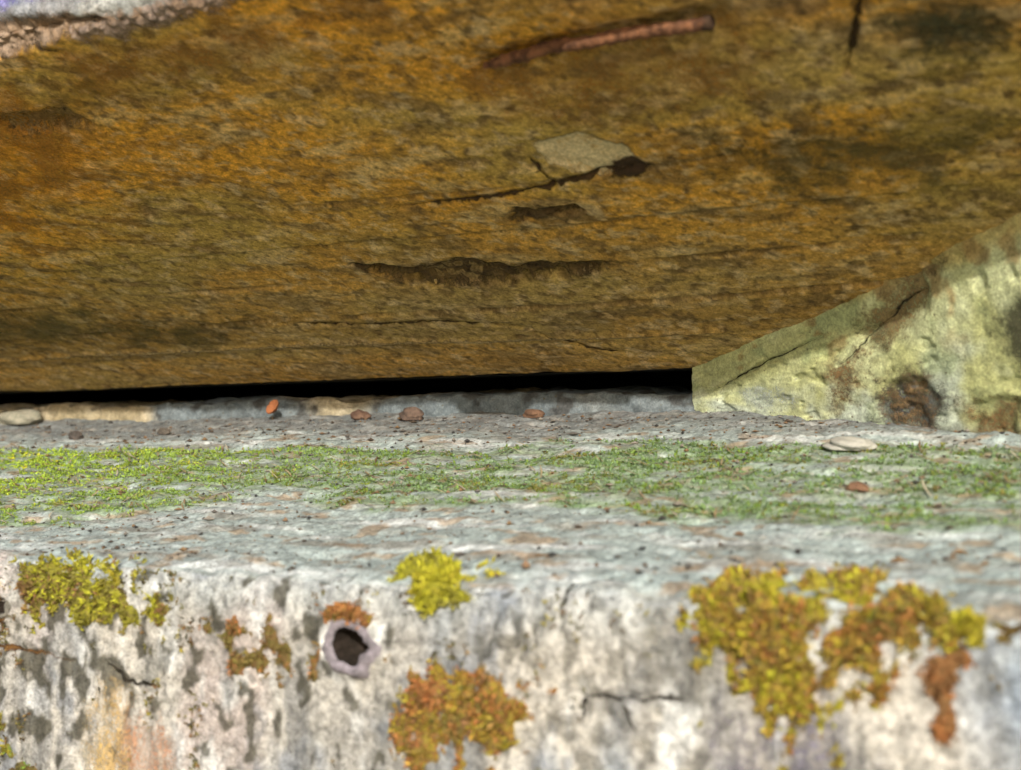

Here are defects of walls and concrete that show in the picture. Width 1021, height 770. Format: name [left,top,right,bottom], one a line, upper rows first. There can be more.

corrosion [483,14,715,69]
spalling [534,132,652,178]
crack [409,157,636,205]
spalling [354,257,618,287]
crack [847,290,922,359]
crack [719,339,816,388]